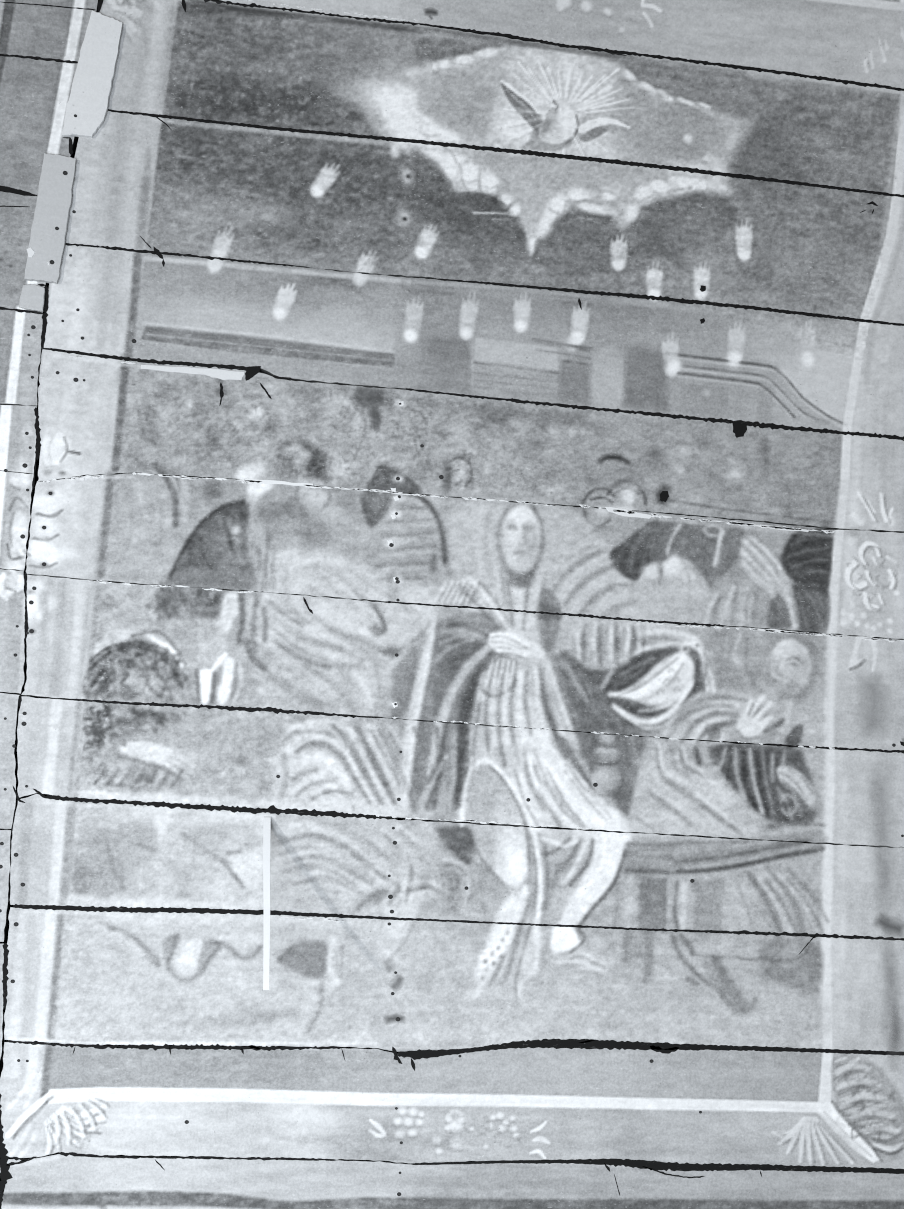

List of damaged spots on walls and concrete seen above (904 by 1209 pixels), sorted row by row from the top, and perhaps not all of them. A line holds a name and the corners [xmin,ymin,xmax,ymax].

crack [181,0,904,91]
crack [109,110,904,214]
crack [437,279,904,326]
crack [0,284,293,406]
crack [404,388,904,441]
crack [74,699,356,718]
crack [13,786,398,820]
crack [13,904,904,954]
crack [7,1040,345,1060]
crack [392,1039,904,1071]
crack [0,1094,335,1209]
crack [411,1158,904,1195]